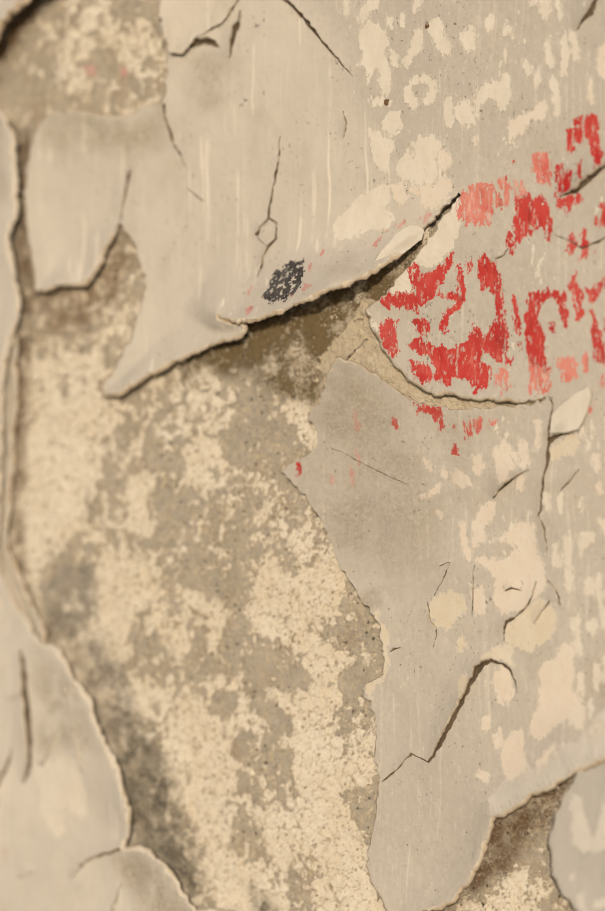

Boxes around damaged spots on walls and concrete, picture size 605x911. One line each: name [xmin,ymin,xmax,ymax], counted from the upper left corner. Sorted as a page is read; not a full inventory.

crack [185,7,241,57]
crack [283,0,351,74]
peeling [413,83,428,101]
crack [492,397,580,550]
crack [503,580,561,641]
crack [0,650,49,783]
crack [384,659,517,780]
peeling [568,791,605,856]
peeling [576,888,605,911]